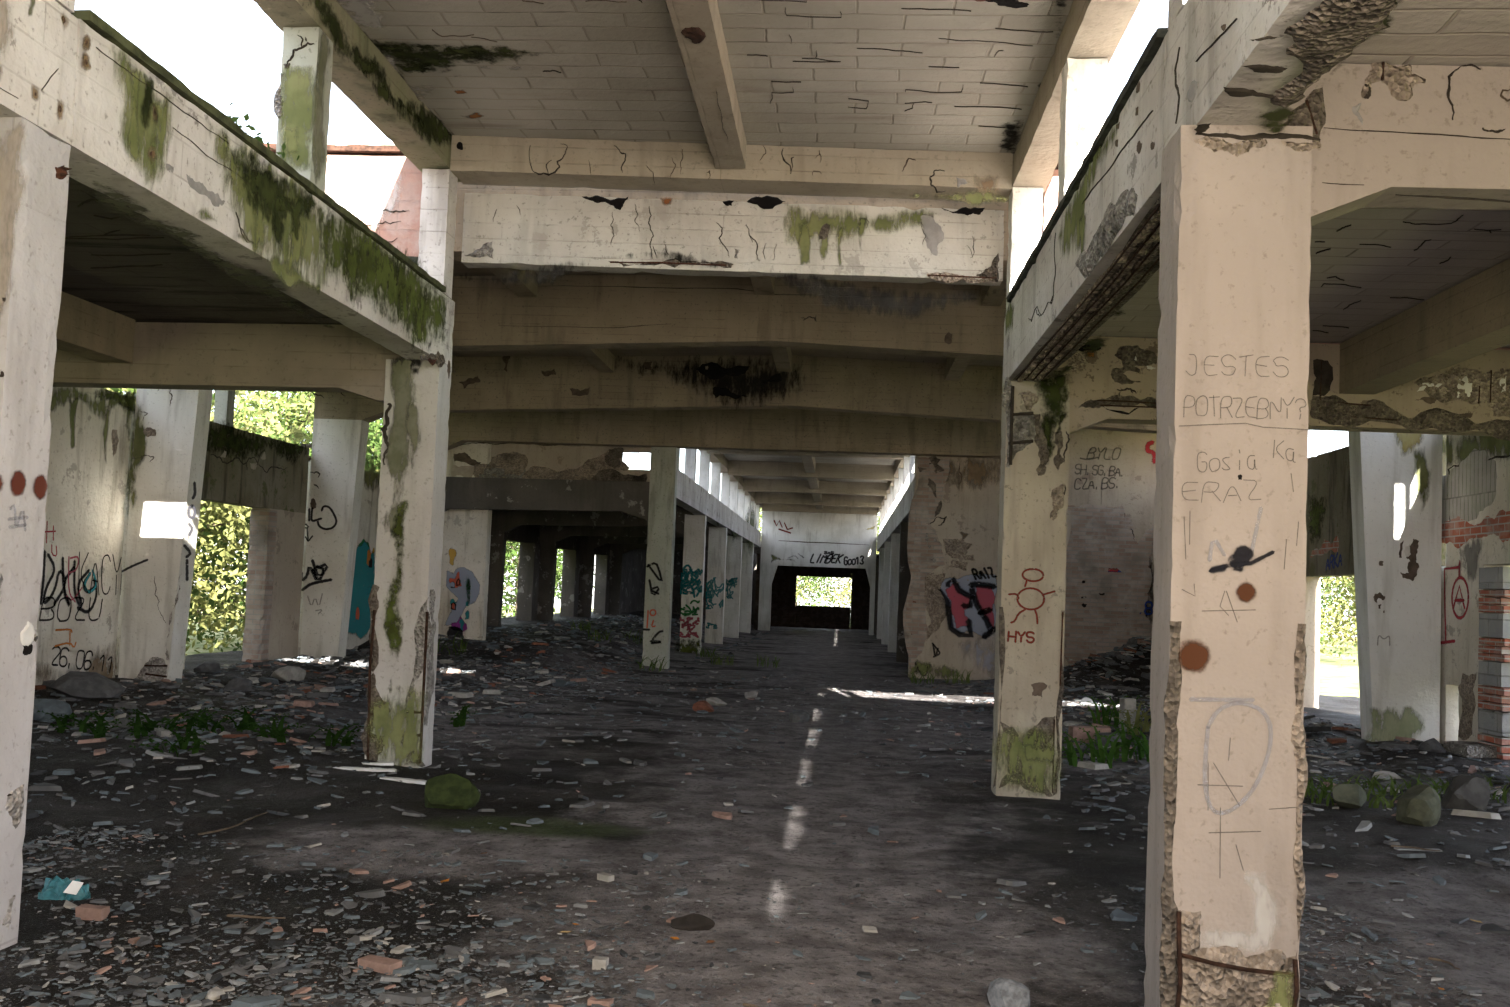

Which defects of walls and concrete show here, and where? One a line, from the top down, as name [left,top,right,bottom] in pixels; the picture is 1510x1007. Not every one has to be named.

crack [432,29,497,42]
crack [747,0,1053,128]
spalling [1194,0,1398,157]
water stain [93,0,485,327]
spalling [722,196,785,209]
water stain [799,218,866,265]
water stain [393,281,426,373]
mould [615,356,805,409]
peeling [993,188,1161,797]
spalling [1310,359,1510,548]
water stain [383,501,408,655]
spalling [1159,621,1308,1007]